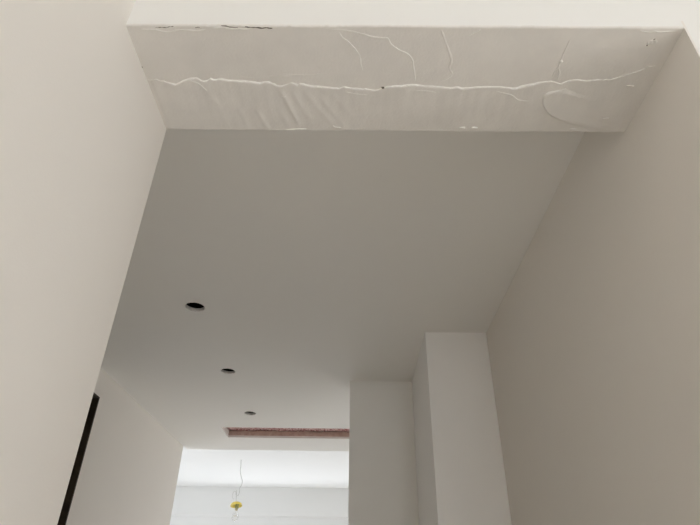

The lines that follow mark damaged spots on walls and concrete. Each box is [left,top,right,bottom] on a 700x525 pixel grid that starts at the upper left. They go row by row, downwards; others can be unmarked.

crack [147,28,655,101]